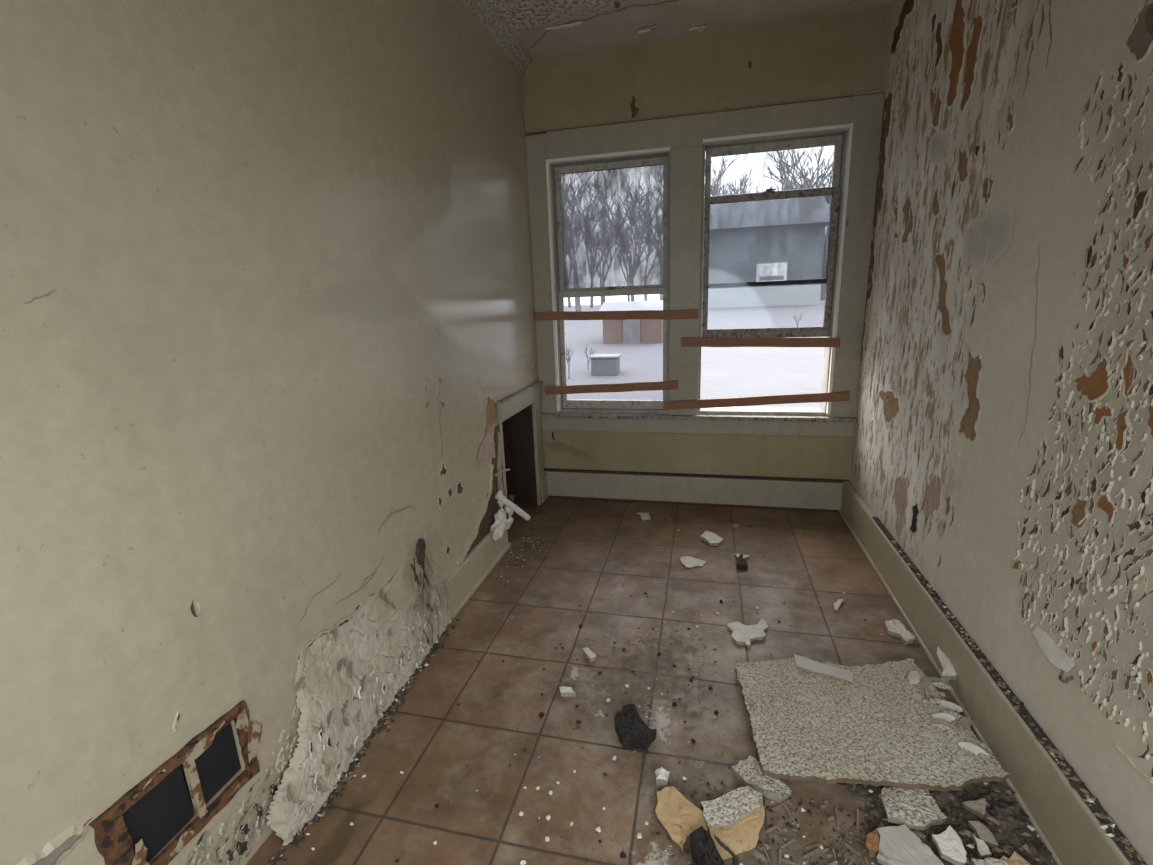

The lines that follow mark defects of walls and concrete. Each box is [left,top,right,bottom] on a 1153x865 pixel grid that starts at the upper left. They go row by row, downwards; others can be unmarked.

spalling [438,461,464,511]
peeling [849,0,1045,570]
peeling [1011,0,1153,790]
flaking render [266,533,452,845]
spalling [908,671,988,755]